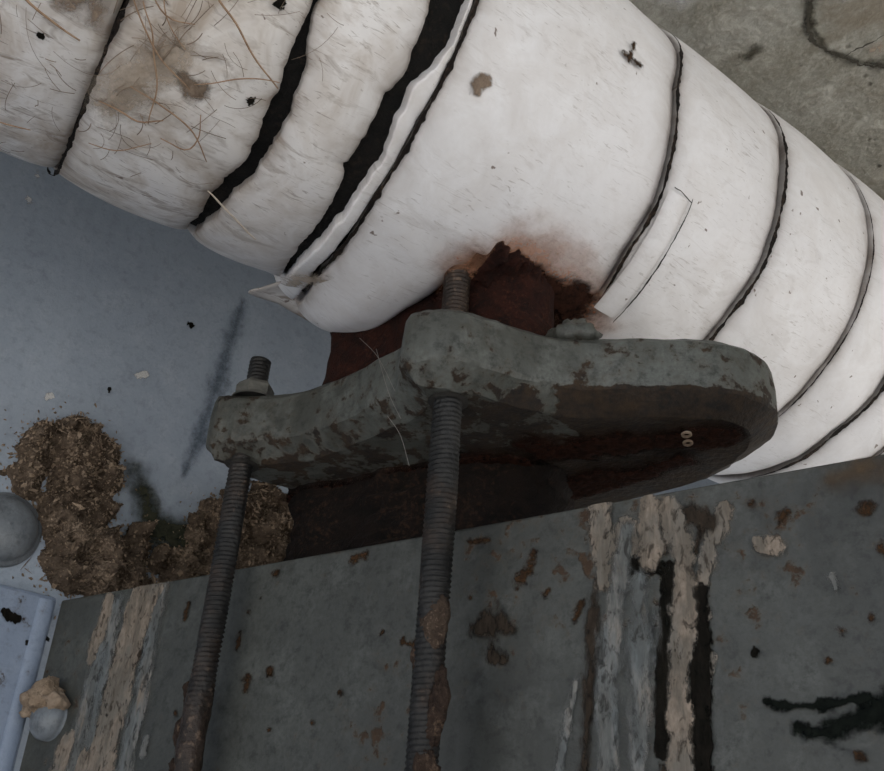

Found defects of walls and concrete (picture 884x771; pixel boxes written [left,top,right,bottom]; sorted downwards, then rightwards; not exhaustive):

crack [803,0,884,69]
corrosion [504,236,601,330]
corrosion [514,548,538,590]
corrosion [469,600,516,666]
water stain [579,494,734,771]
water stain [762,688,884,744]